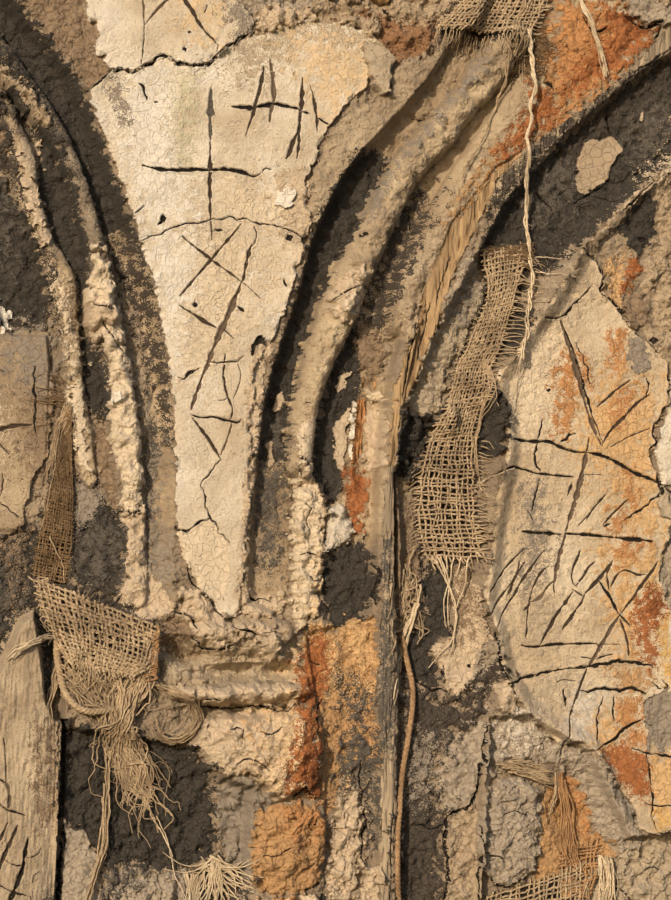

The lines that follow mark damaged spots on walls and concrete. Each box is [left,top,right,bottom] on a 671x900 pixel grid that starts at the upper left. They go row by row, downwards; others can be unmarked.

crack [86,26,250,93]
corrosion [430,0,660,250]
flaking render [575,136,623,195]
crack [144,216,308,246]
spalling [591,110,671,374]
crack [545,246,658,353]
crack [643,374,671,449]
corrosion [540,243,671,833]
crack [604,477,665,527]
corrosion [218,517,341,867]
crack [485,626,671,842]
crack [0,824,67,900]